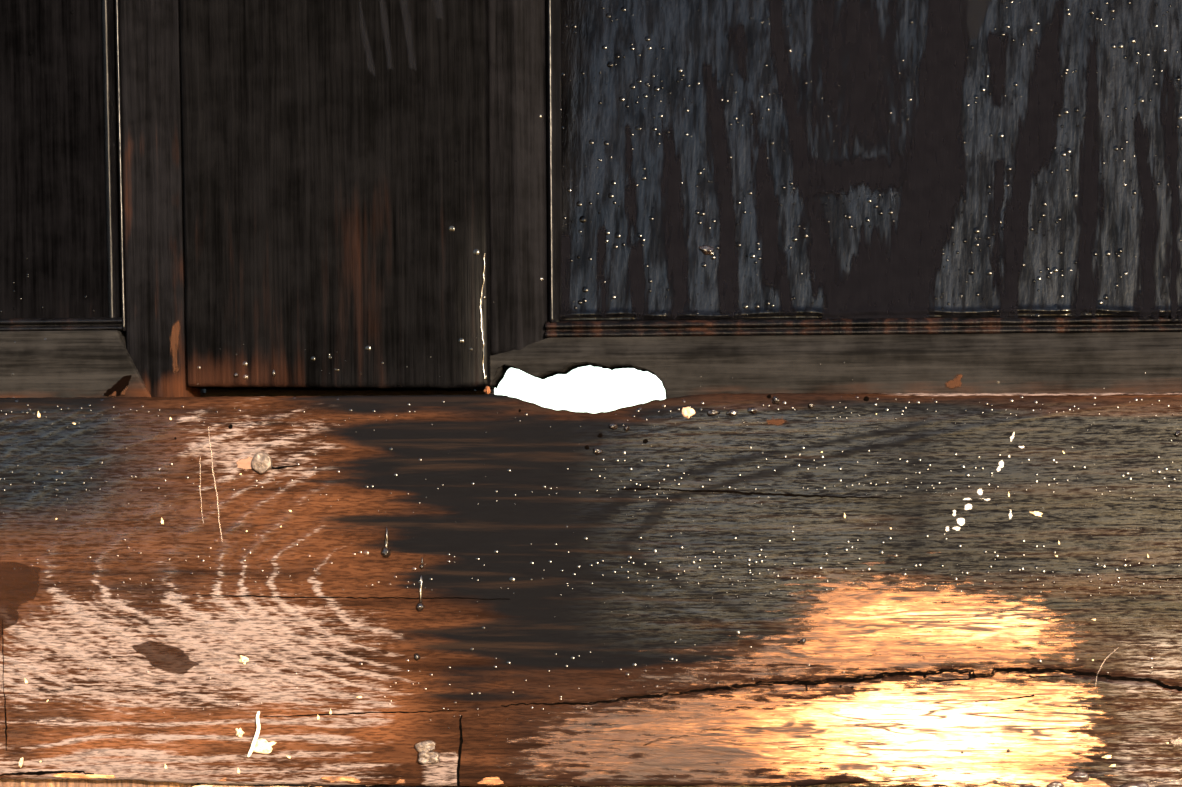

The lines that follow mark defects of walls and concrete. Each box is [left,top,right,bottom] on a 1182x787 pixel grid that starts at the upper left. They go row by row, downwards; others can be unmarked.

damp [0,562,41,638]
damp [133,641,199,674]
crack [501,667,1182,707]
crack [263,710,466,786]
crack [643,727,836,764]